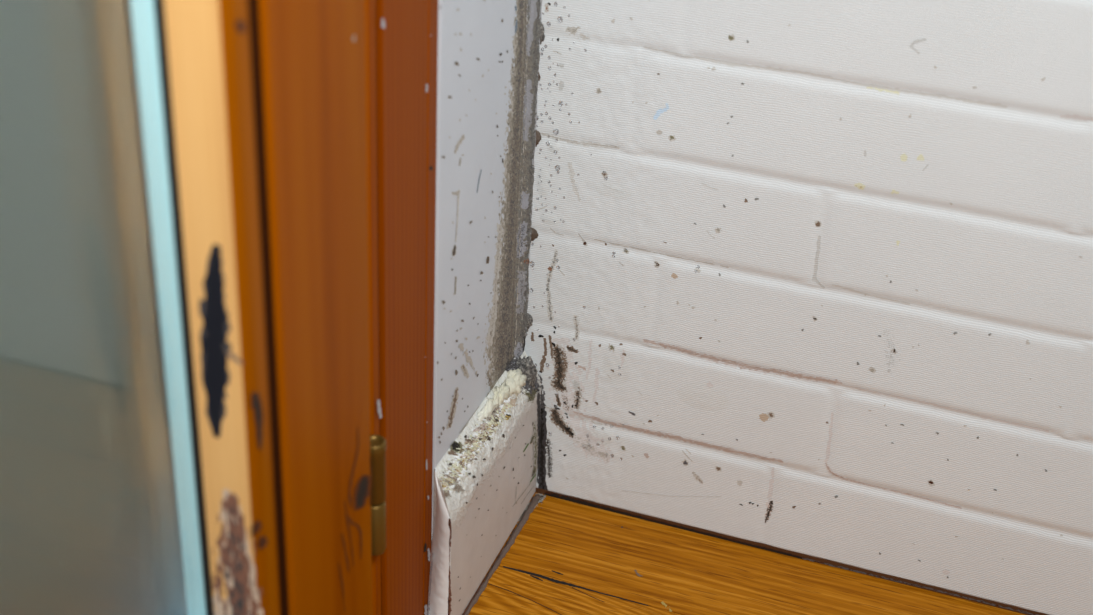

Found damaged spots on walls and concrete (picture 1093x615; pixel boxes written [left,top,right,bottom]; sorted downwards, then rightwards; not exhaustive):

water stain [438,0,1039,615]